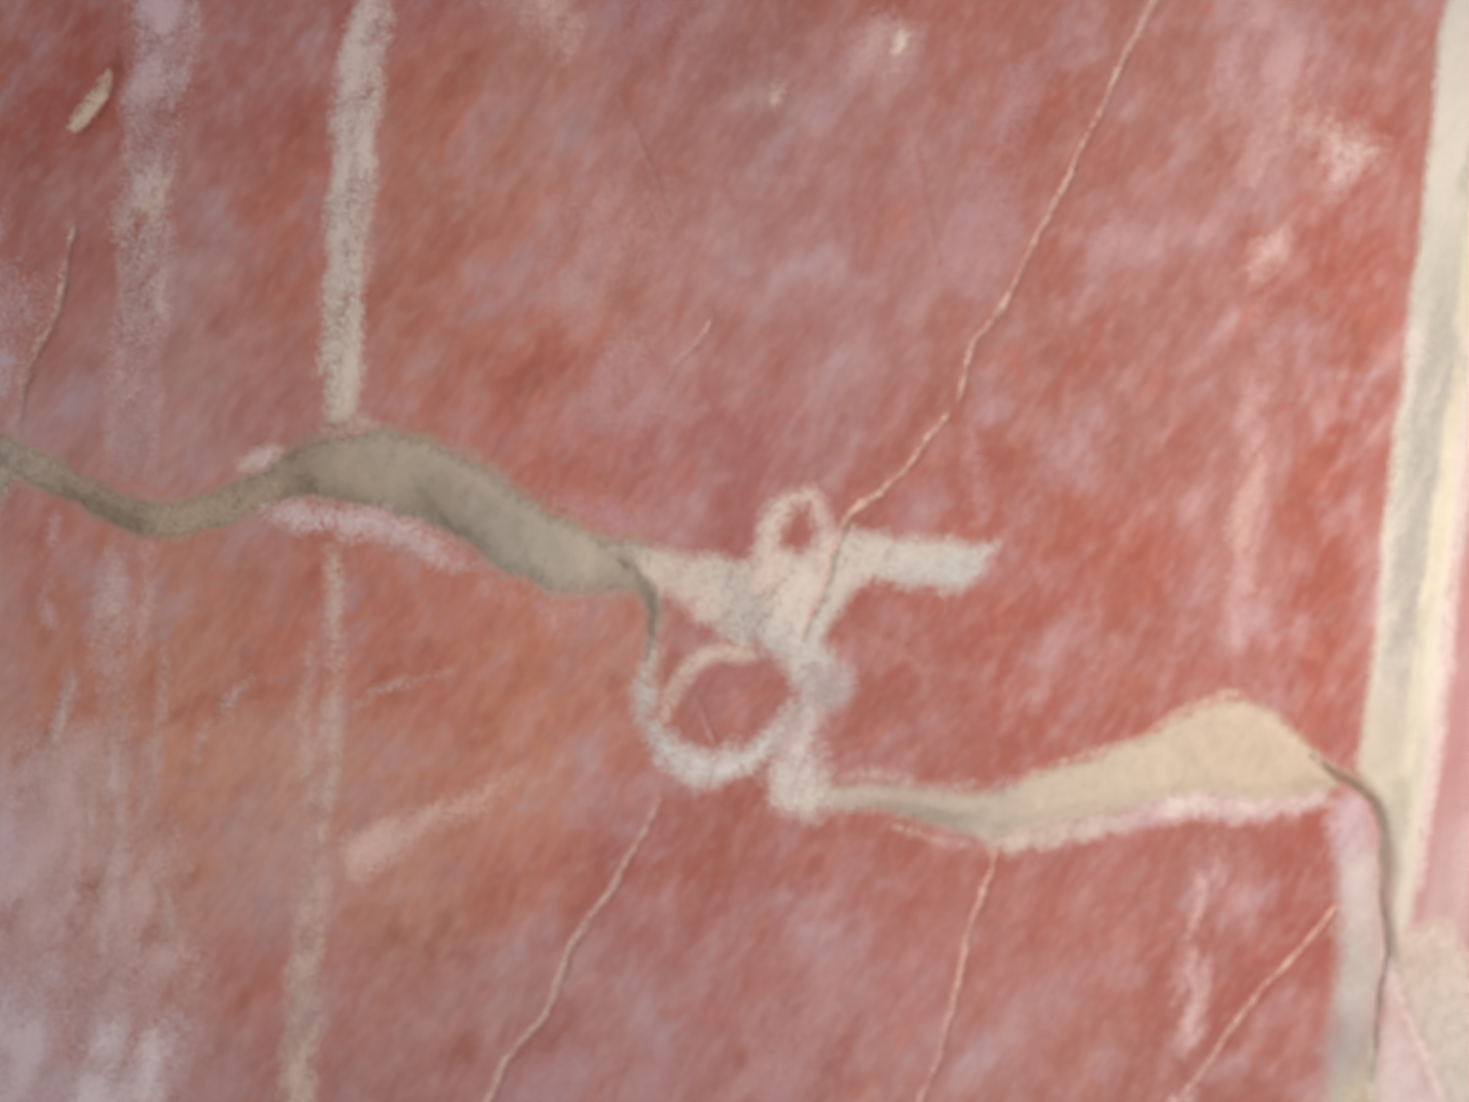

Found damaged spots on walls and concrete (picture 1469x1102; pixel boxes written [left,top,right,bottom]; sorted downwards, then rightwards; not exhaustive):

crack [13,226,79,423]
crack [799,0,1162,641]
crack [482,796,664,1102]
crack [916,844,1002,1102]
crack [1173,902,1341,1102]
crack [1322,763,1405,1084]